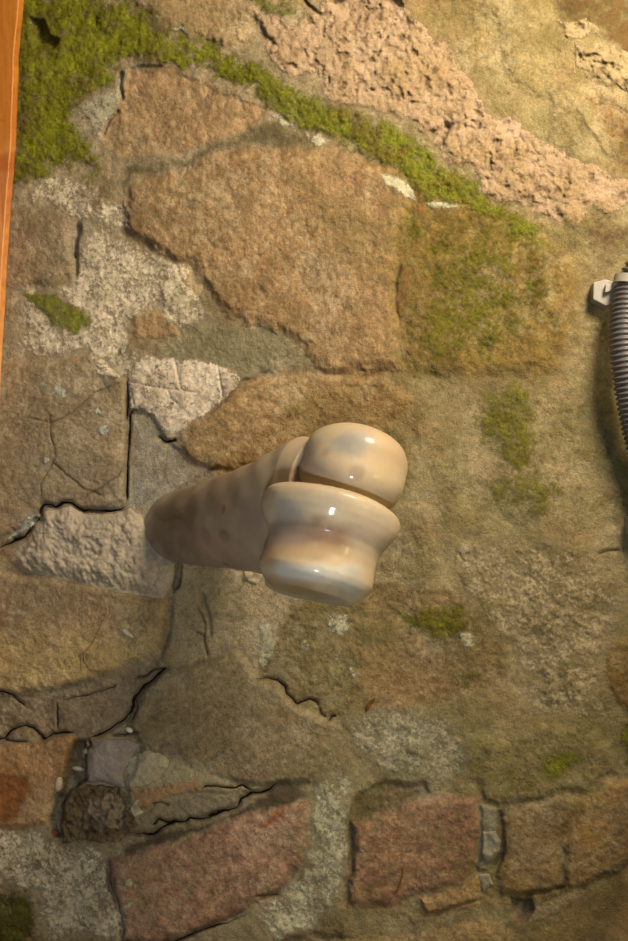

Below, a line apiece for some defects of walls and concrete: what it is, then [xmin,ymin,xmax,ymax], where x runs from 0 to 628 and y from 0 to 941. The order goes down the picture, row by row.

crack [0,382,160,548]
crack [0,667,167,755]
crack [258,677,336,722]
crack [122,781,283,838]